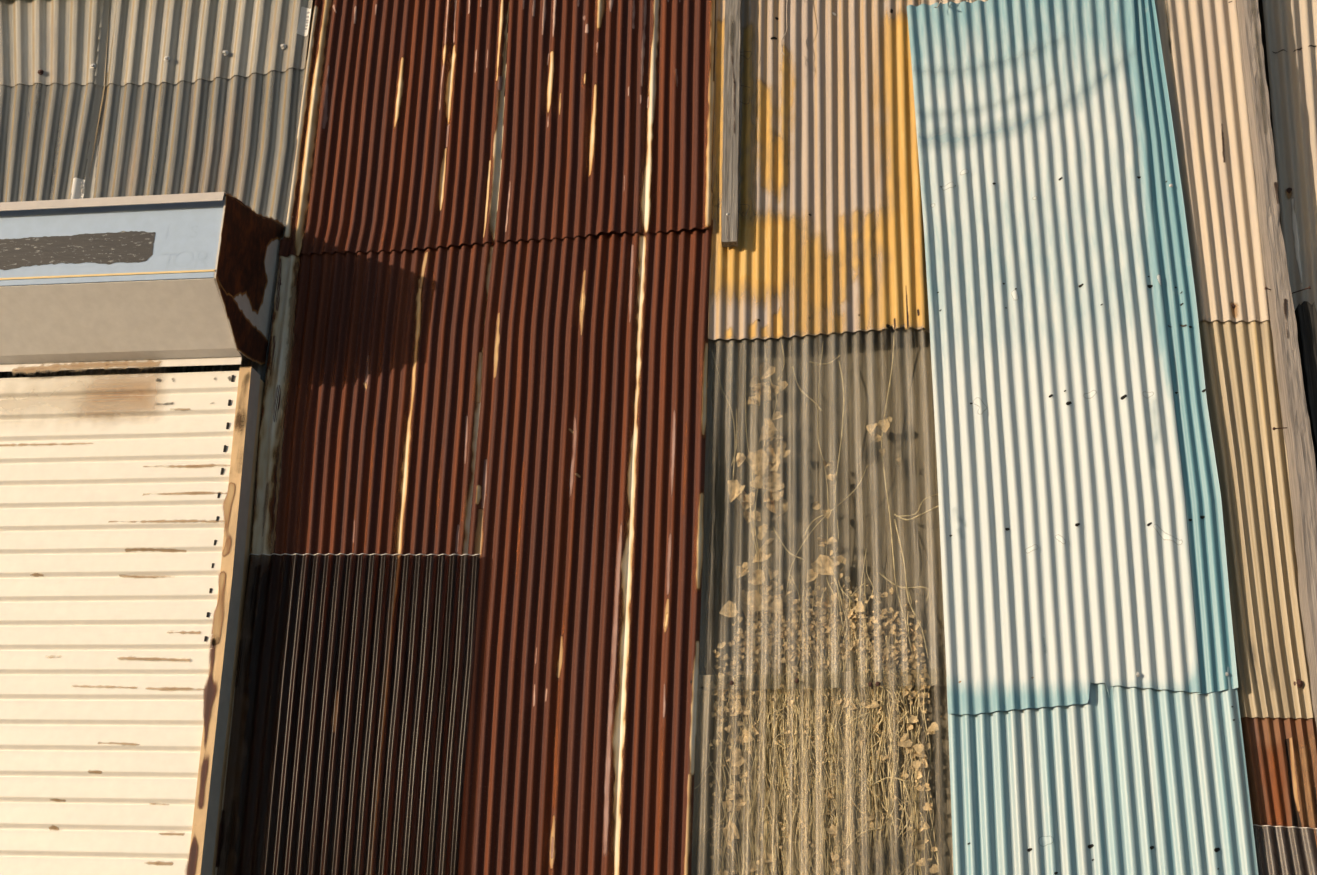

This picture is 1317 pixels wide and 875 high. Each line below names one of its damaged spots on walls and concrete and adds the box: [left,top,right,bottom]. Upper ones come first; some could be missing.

corrosion [216,194,284,389]
corrosion [331,690,339,733]
corrosion [1268,752,1286,827]